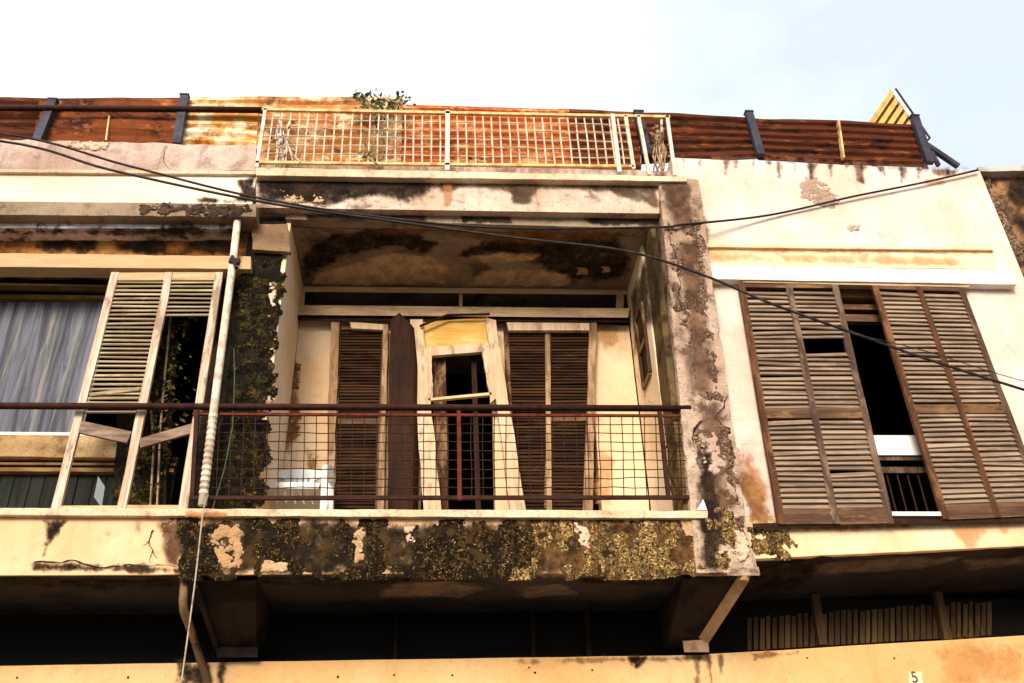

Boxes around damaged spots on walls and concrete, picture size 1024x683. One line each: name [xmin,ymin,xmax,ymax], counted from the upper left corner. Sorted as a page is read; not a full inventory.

damp [714,156,885,183]
damp [36,228,250,255]
peeling [139,202,252,218]
damp [197,176,659,282]
damp [560,183,708,235]
spalling [983,177,1024,268]
spalling [664,219,724,402]
damp [0,404,771,598]
spalling [679,426,750,570]
crack [34,530,177,569]
peeling [352,527,366,563]
peeling [574,522,590,549]